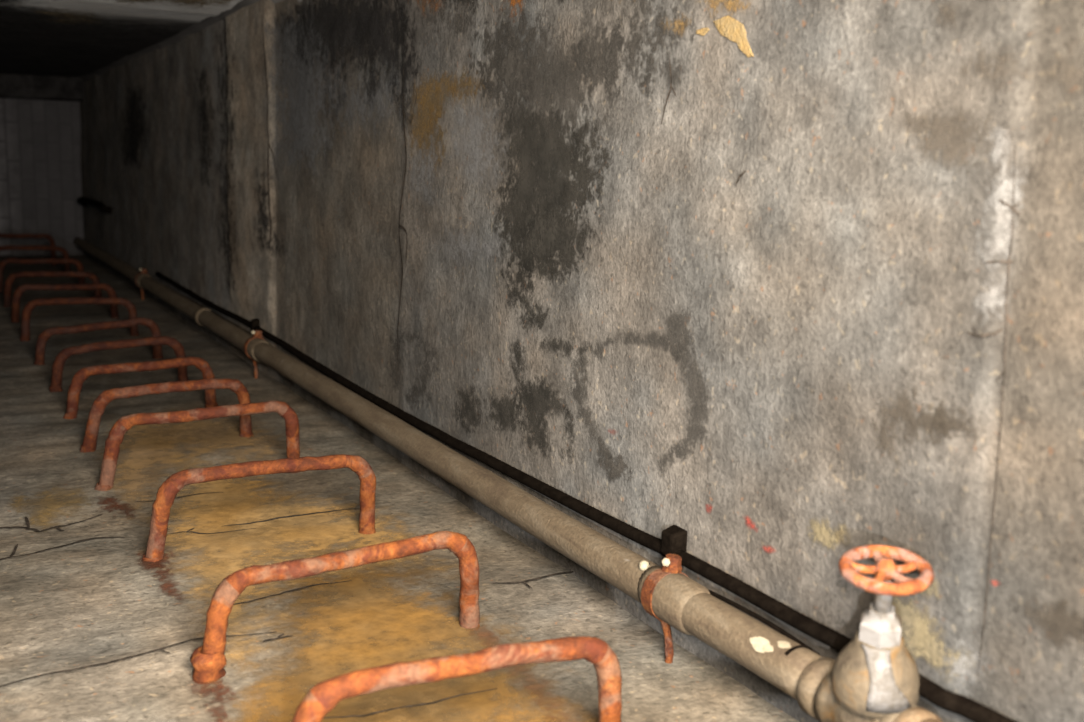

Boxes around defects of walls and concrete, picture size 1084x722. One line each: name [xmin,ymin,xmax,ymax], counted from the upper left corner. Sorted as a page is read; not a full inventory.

peeling [696,15,754,58]
water stain [265,0,417,164]
crack [396,67,407,382]
water stain [427,0,709,482]
crack [136,492,224,502]
crack [0,514,125,560]
crack [170,508,358,534]
crack [233,580,352,605]
crack [0,631,293,687]